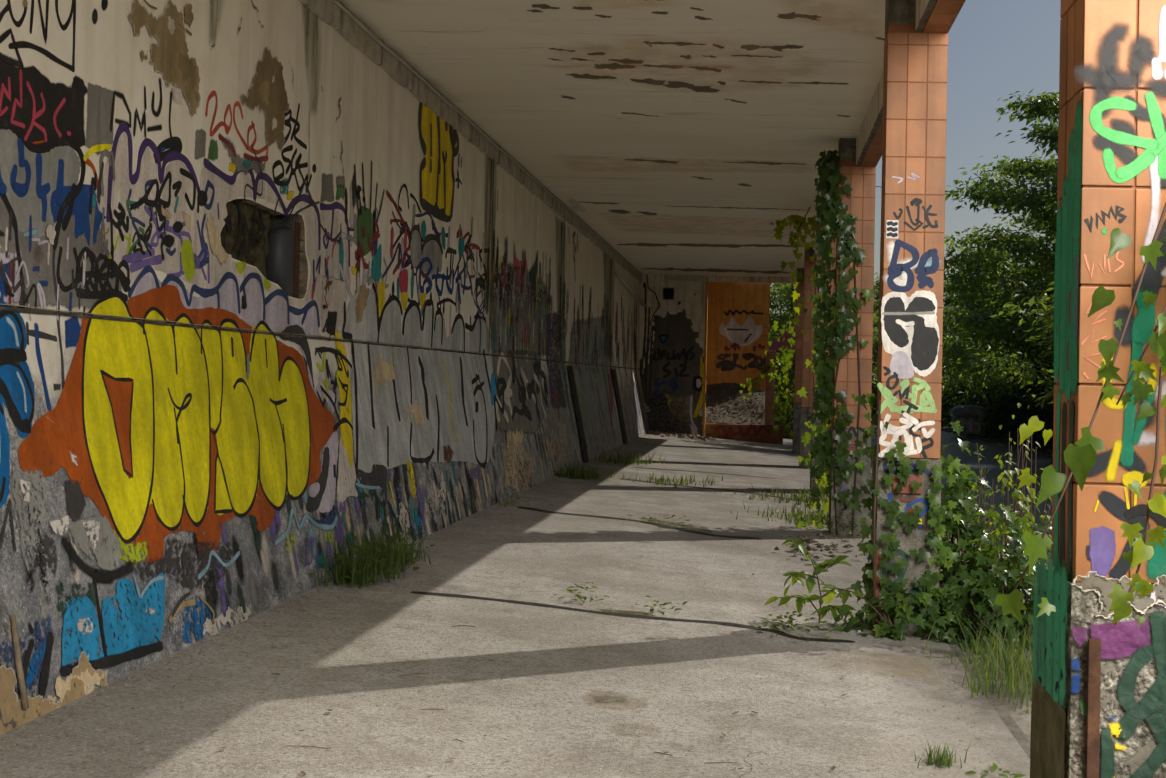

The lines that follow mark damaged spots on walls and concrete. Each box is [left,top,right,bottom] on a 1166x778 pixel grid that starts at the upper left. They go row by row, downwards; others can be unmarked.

peeling [527,4,612,18]
peeling [778,12,821,21]
flaking render [129,0,201,117]
peeling [547,41,847,103]
flaking render [241,47,290,151]
spalling [207,199,308,299]
peeling [20,479,30,502]
peeling [50,516,69,535]
peeling [83,520,100,550]
spalling [1071,571,1166,619]
peeling [77,618,93,635]
spalling [0,651,108,735]